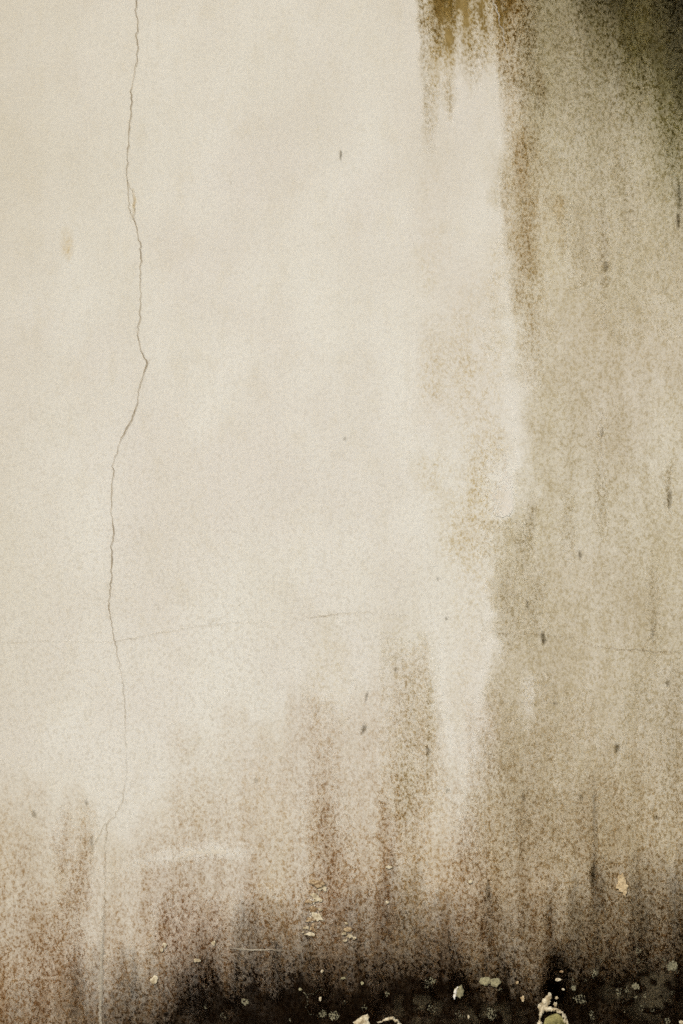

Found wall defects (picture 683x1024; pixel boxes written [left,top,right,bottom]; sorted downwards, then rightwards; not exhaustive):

damp [423,0,523,53]
damp [0,846,683,1024]
flaking render [353,1014,401,1024]
flaking render [453,985,464,999]
flaking render [479,977,501,987]
flaking render [537,970,569,1024]